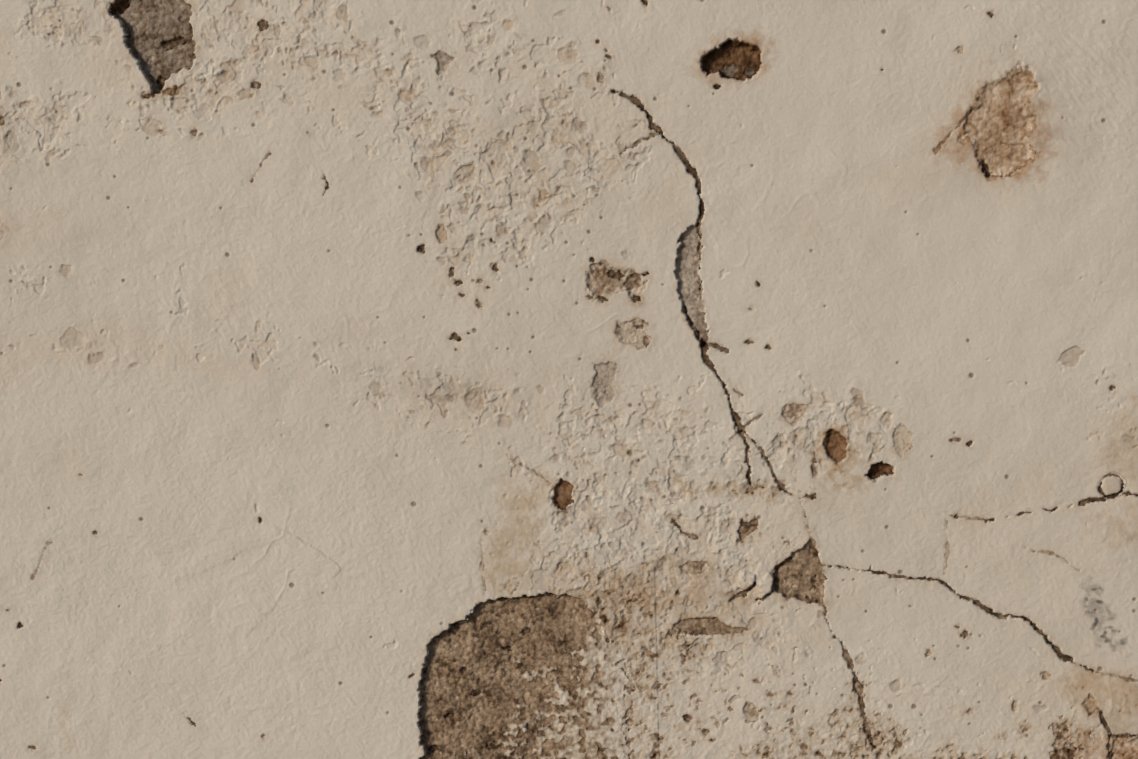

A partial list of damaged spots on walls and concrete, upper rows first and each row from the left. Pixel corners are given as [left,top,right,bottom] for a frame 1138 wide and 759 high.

spalling [109,0,287,99]
peeling [933,63,1038,181]
spalling [607,269,649,302]
crack [611,90,809,529]
crack [671,520,698,540]
crack [729,582,774,602]
spalling [737,538,828,605]
crack [825,492,1138,682]
spalling [409,556,907,759]
crack [821,598,873,743]
spalling [1049,694,1098,759]
crack [1089,708,1112,759]